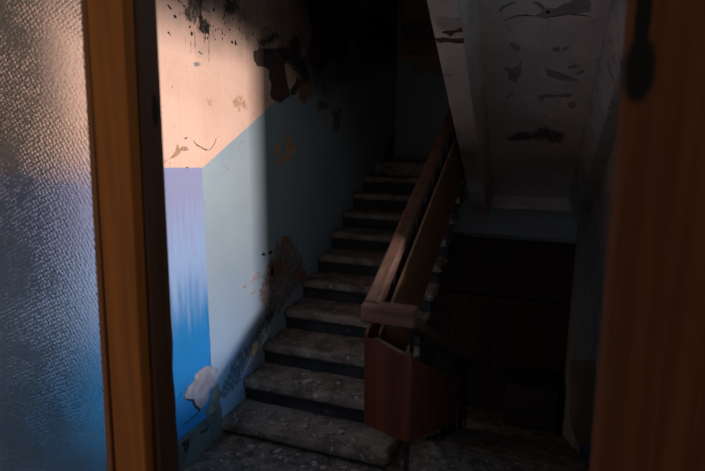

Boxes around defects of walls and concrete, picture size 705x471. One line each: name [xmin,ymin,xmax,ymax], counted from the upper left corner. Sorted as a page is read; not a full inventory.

peeling [532,0,592,18]
water stain [167,0,310,84]
peeling [253,48,312,104]
peeling [184,366,221,417]